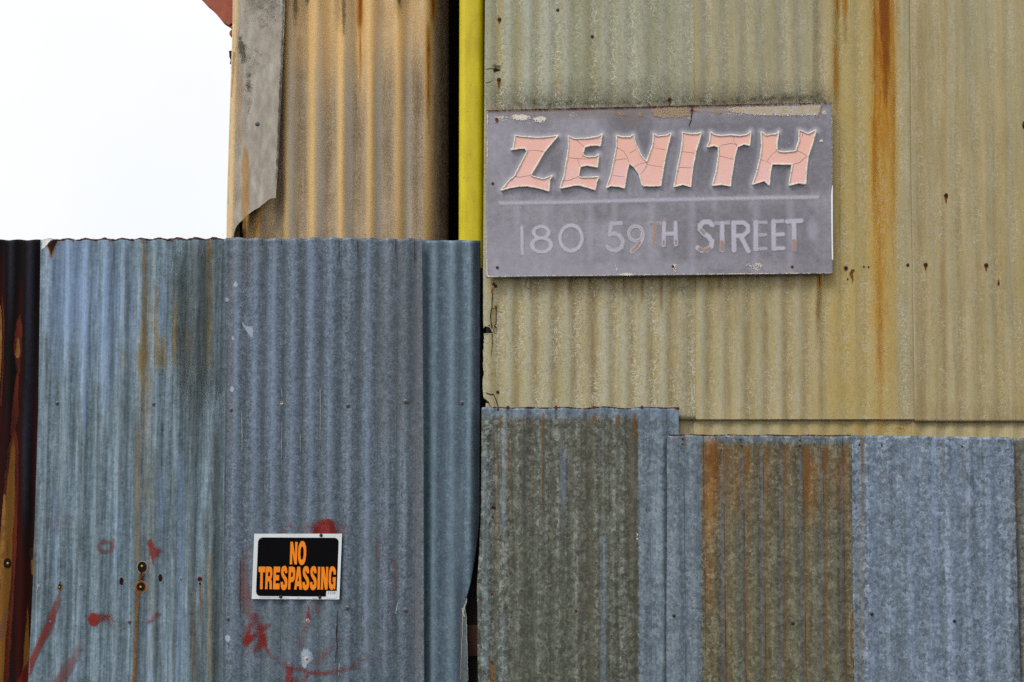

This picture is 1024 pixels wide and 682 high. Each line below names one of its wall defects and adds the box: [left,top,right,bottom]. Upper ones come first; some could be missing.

rust [427,0,436,100]
rust [874,0,894,147]
rust [0,296,34,682]
rust [493,406,679,443]
rust [669,434,851,507]